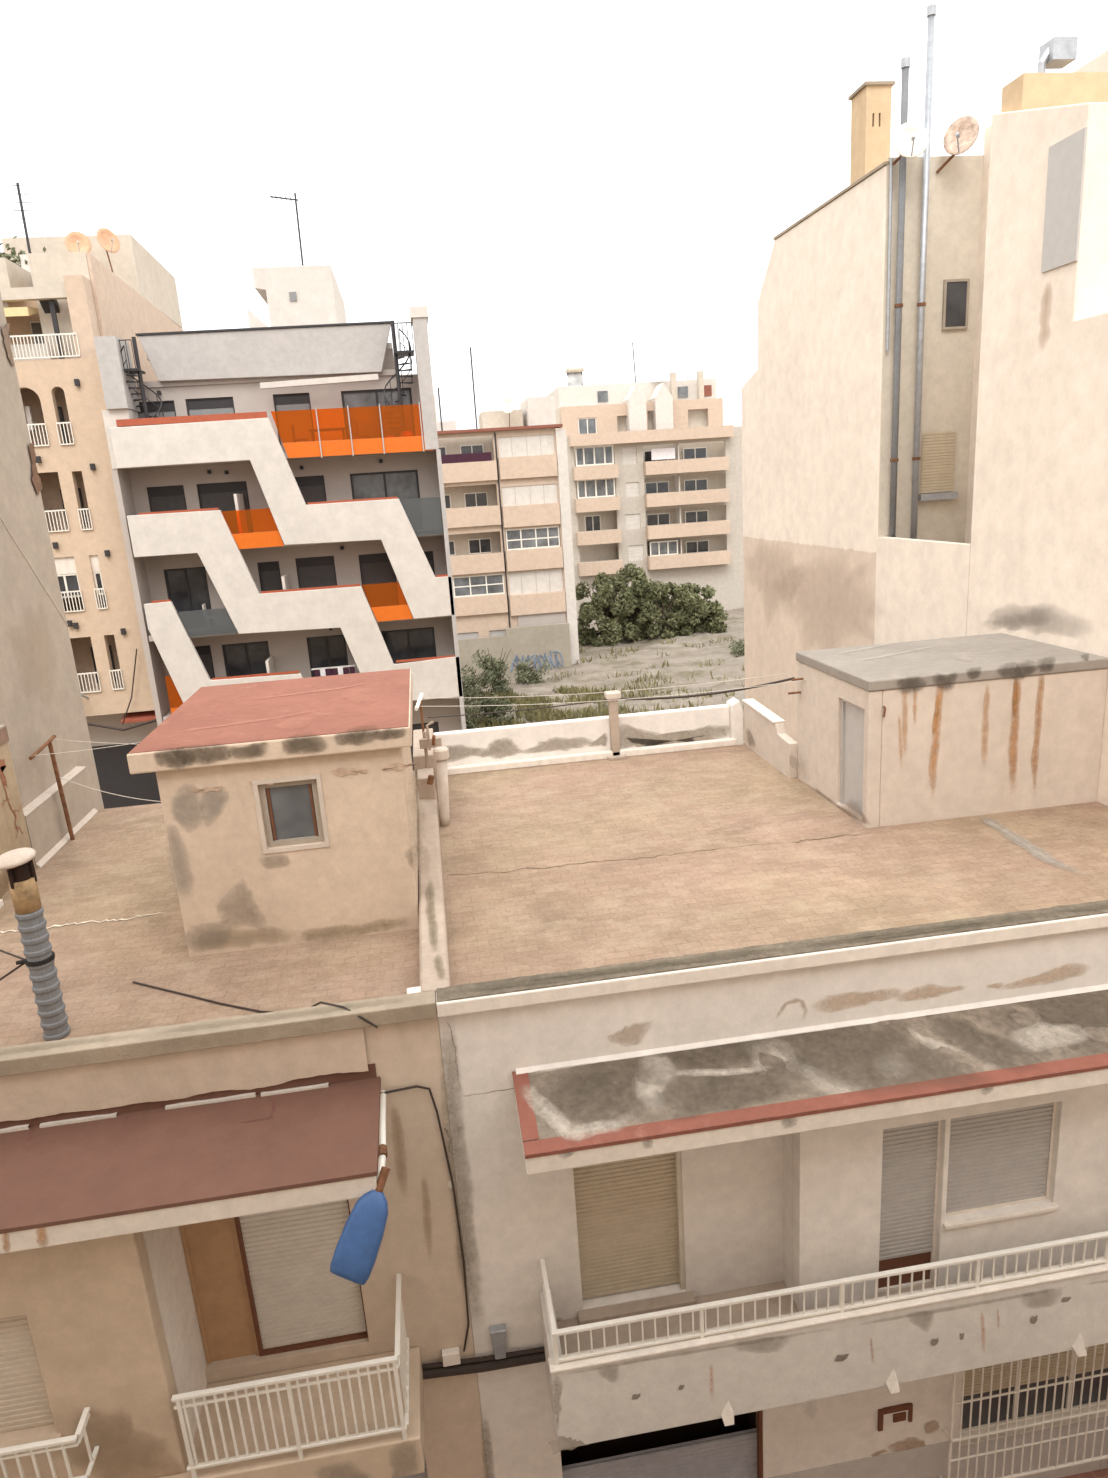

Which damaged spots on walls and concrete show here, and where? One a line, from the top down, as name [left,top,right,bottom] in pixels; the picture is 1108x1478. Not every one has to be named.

water stain [156,744,263,767]
water stain [285,736,322,752]
water stain [340,728,402,744]
corrosion [931,688,942,773]
corrosion [1010,680,1043,773]
crack [0,759,23,837]
peeling [990,966,1079,988]
peeling [829,992,885,1009]
peeling [906,987,953,1000]
water stain [532,1096,606,1153]